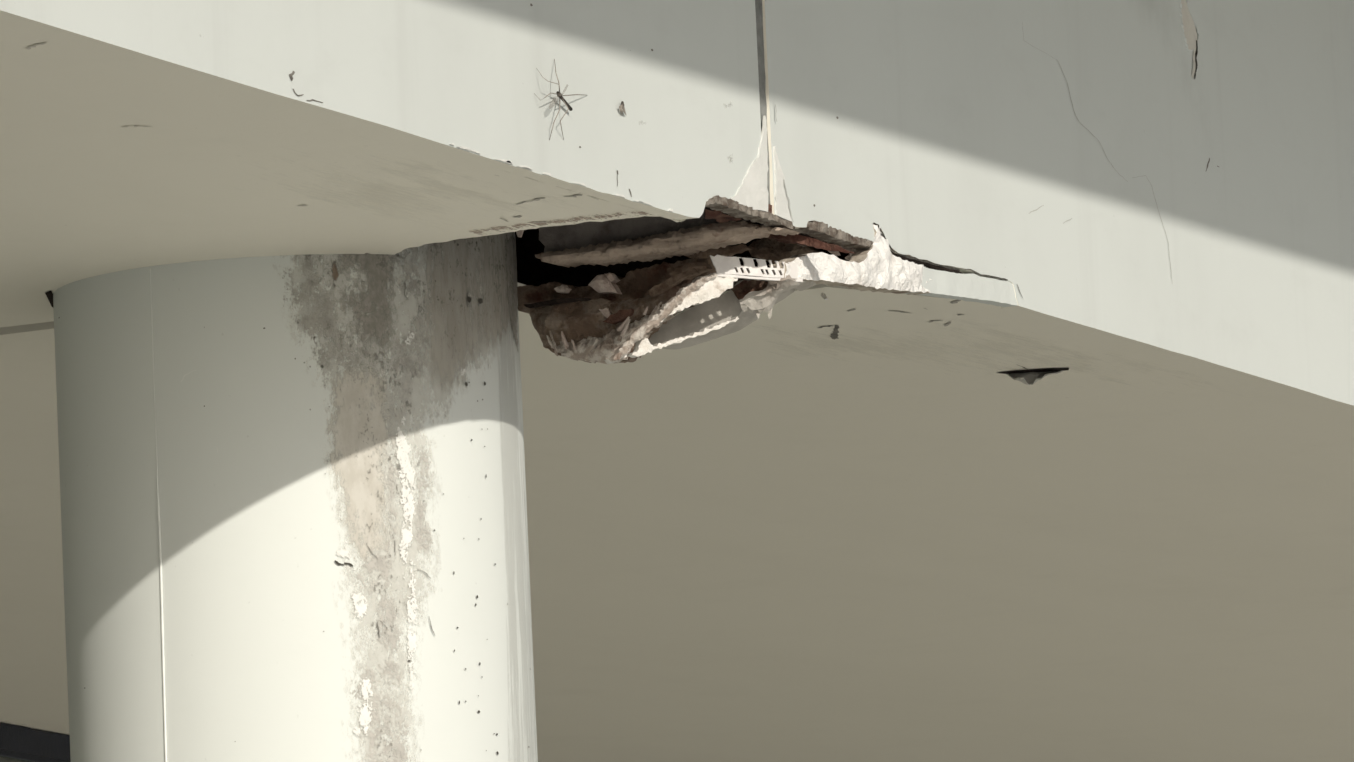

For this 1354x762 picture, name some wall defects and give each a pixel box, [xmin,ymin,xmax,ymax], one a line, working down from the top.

peeling [1180,0,1199,80]
crack [1022,23,1172,278]
spalling [515,194,1018,364]
crack [819,309,856,340]
crack [873,223,1023,326]
peeling [999,365,1069,385]
damp [283,232,518,762]